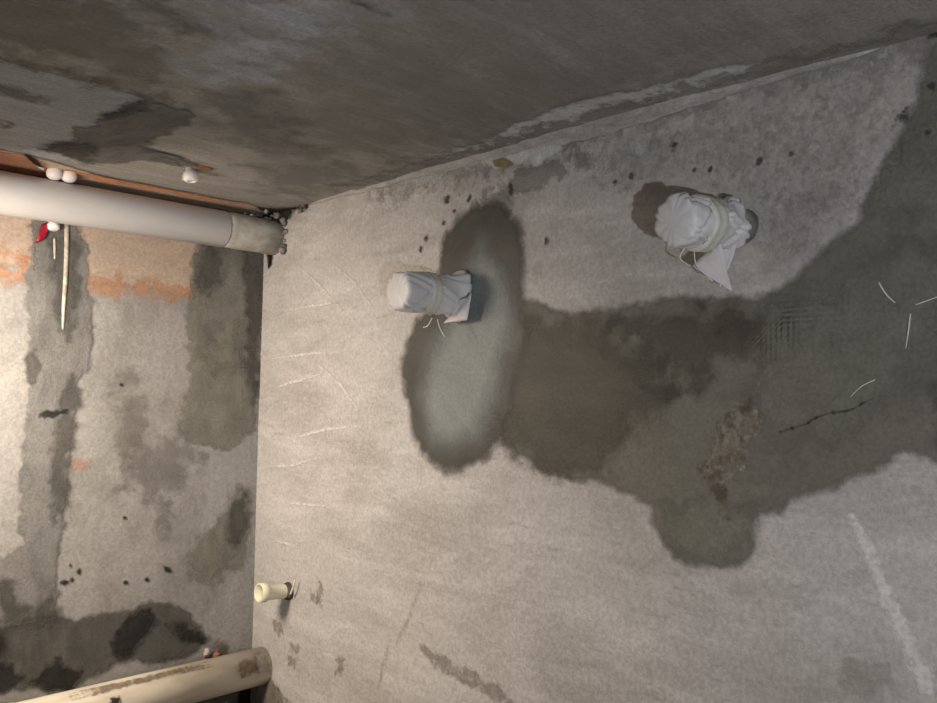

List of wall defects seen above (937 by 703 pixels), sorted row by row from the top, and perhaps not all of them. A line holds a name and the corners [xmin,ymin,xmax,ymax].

leakage [0,0,162,84]
leakage [39,94,201,172]
leakage [177,64,358,195]
rust [0,150,269,215]
rust [0,215,39,283]
rust [77,226,200,301]
leakage [402,32,937,568]
leakage [116,244,264,493]
leakage [0,220,207,692]
leakage [186,487,252,584]